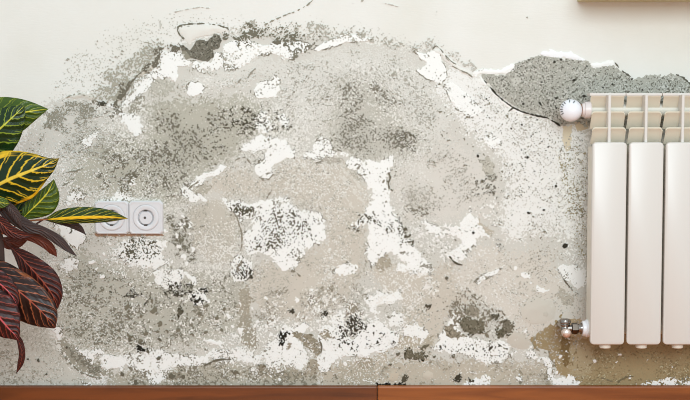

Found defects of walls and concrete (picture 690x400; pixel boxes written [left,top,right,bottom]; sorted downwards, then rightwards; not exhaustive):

peeling [16,84,155,283]
damp [0,33,592,386]
peeling [68,223,549,385]
peeling [122,22,690,306]
crack [432,45,560,126]
damp [562,334,690,385]